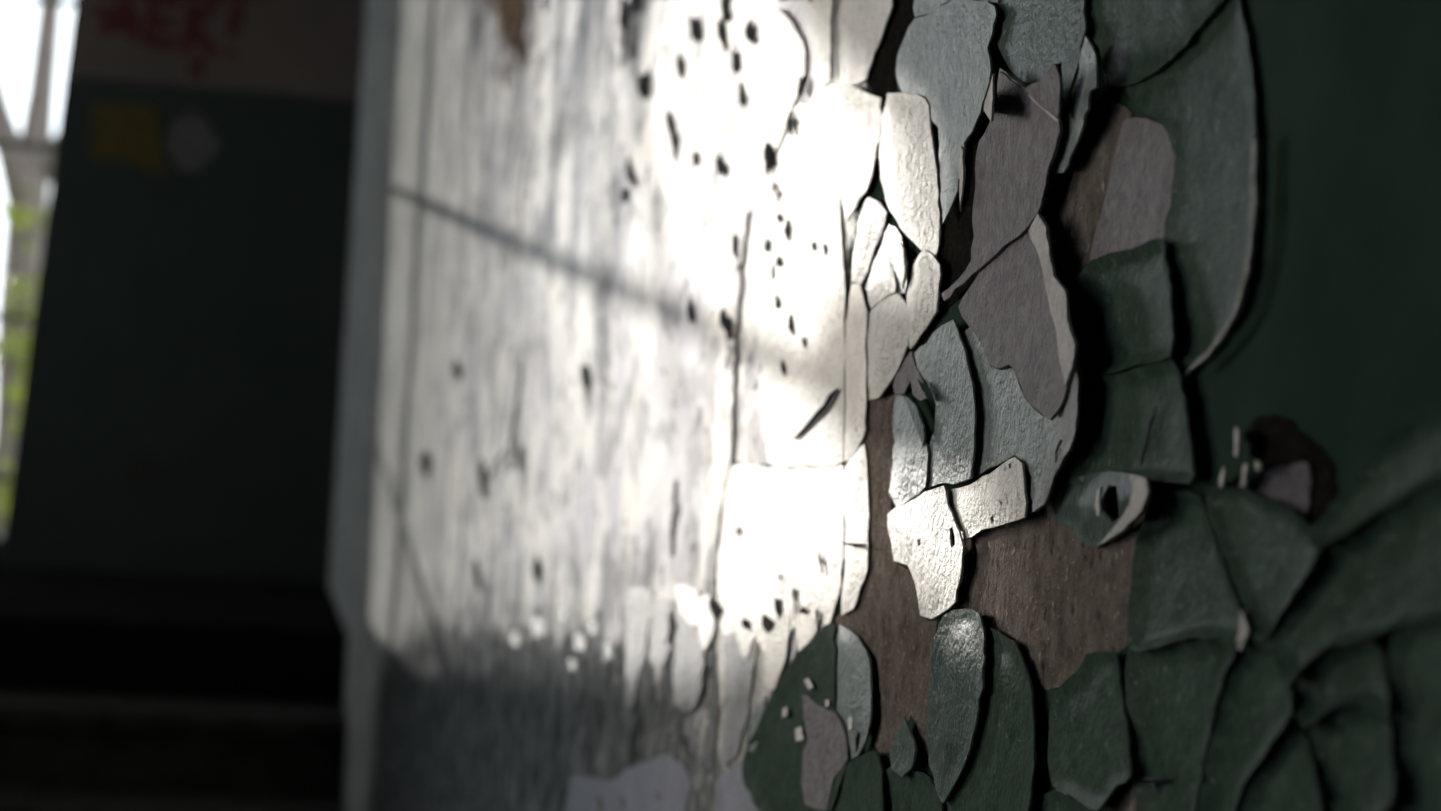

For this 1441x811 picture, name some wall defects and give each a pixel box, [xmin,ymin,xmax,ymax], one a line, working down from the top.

peeling [512,0,1262,811]
spalling [1219,415,1338,527]